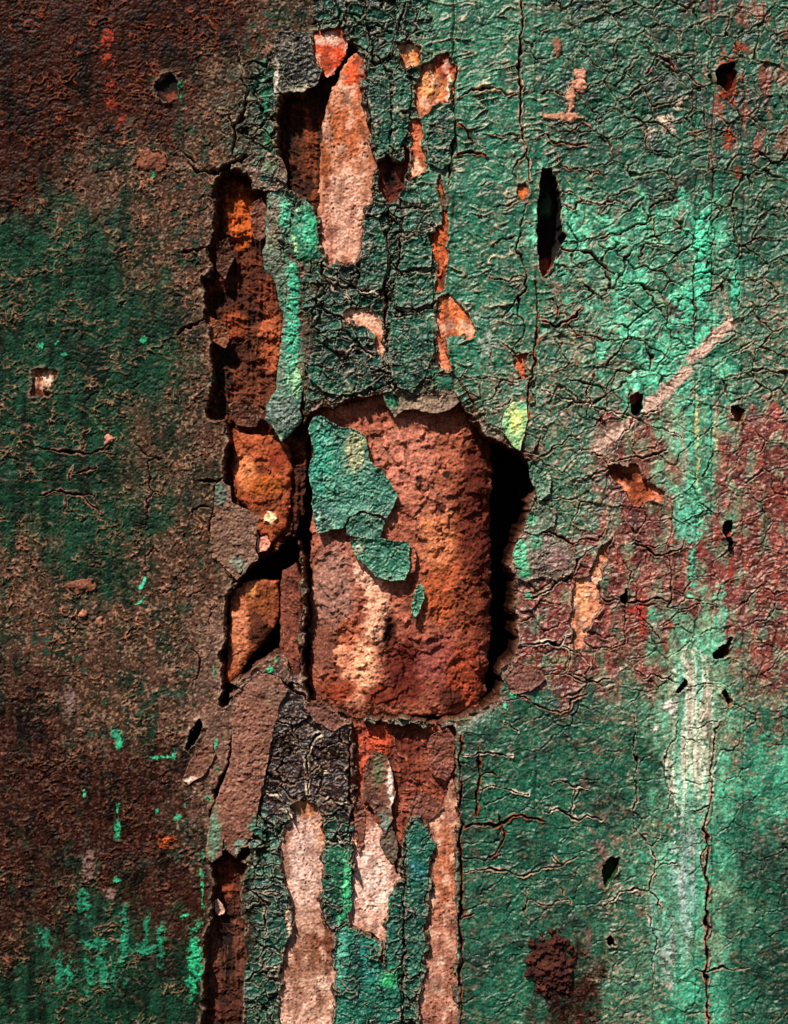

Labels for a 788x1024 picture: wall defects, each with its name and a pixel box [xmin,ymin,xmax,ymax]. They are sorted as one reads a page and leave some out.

rust [101,30,115,66]
peeling [31,368,58,396]
spalling [206,27,493,1024]
crack [317,204,437,386]
peeling [502,400,528,451]
crack [428,0,740,464]
spalling [607,464,664,505]
peeling [504,663,545,694]
crack [516,539,717,714]
rust [629,600,646,640]
crack [456,721,603,1024]
crack [604,711,749,1024]